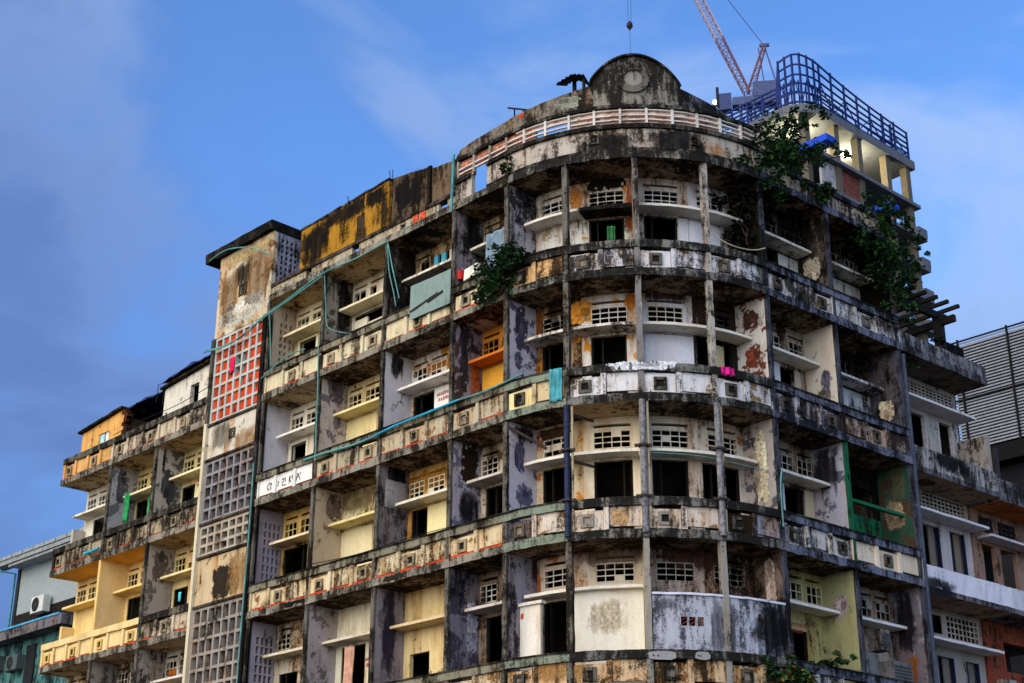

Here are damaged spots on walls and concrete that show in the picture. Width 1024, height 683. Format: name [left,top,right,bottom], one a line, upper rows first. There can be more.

damp [300,171,423,273]
damp [220,238,268,320]
peeling [803,257,820,280]
peeling [571,298,592,325]
peeling [879,400,895,421]
damp [934,451,970,479]
damp [460,492,478,523]
peeling [885,501,905,531]